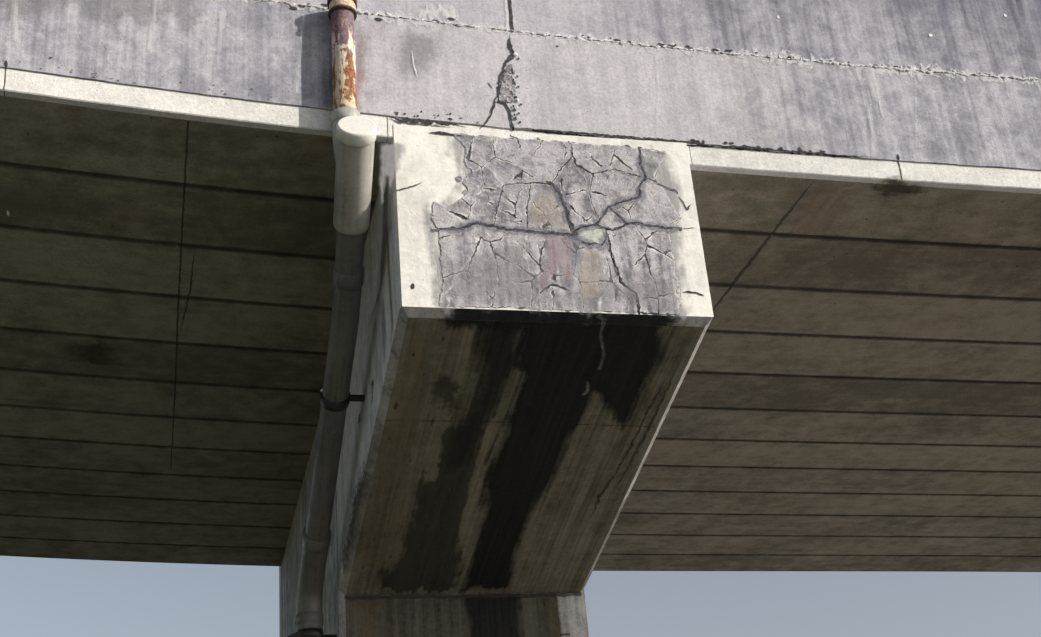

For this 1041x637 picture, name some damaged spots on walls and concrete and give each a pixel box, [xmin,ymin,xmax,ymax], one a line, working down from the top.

crack [170,121,195,468]
crack [430,35,522,142]
leakage [342,157,686,637]
crack [430,141,693,314]